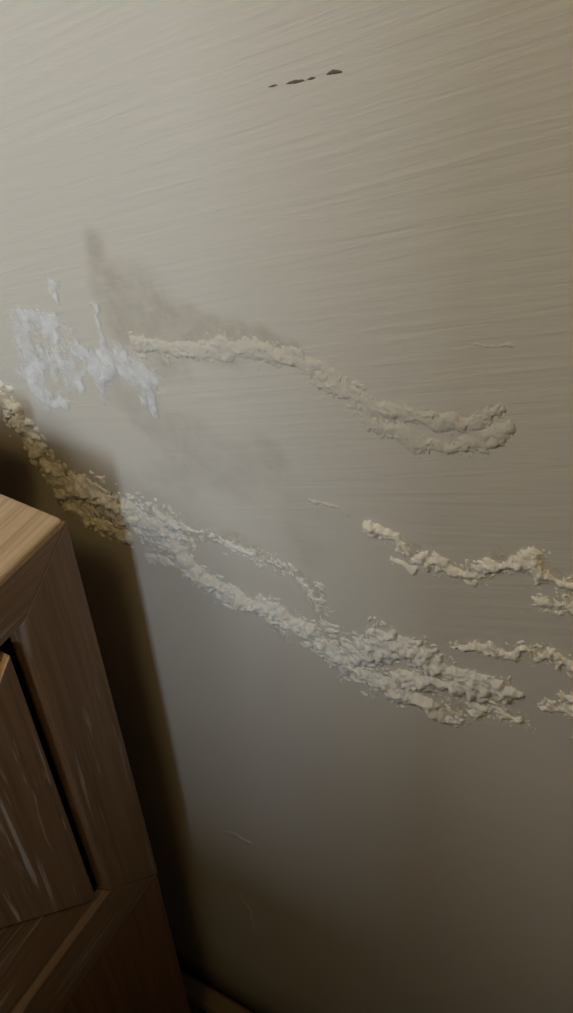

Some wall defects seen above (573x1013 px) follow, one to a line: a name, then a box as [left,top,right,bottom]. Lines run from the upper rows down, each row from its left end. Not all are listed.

damp [0,381,573,734]